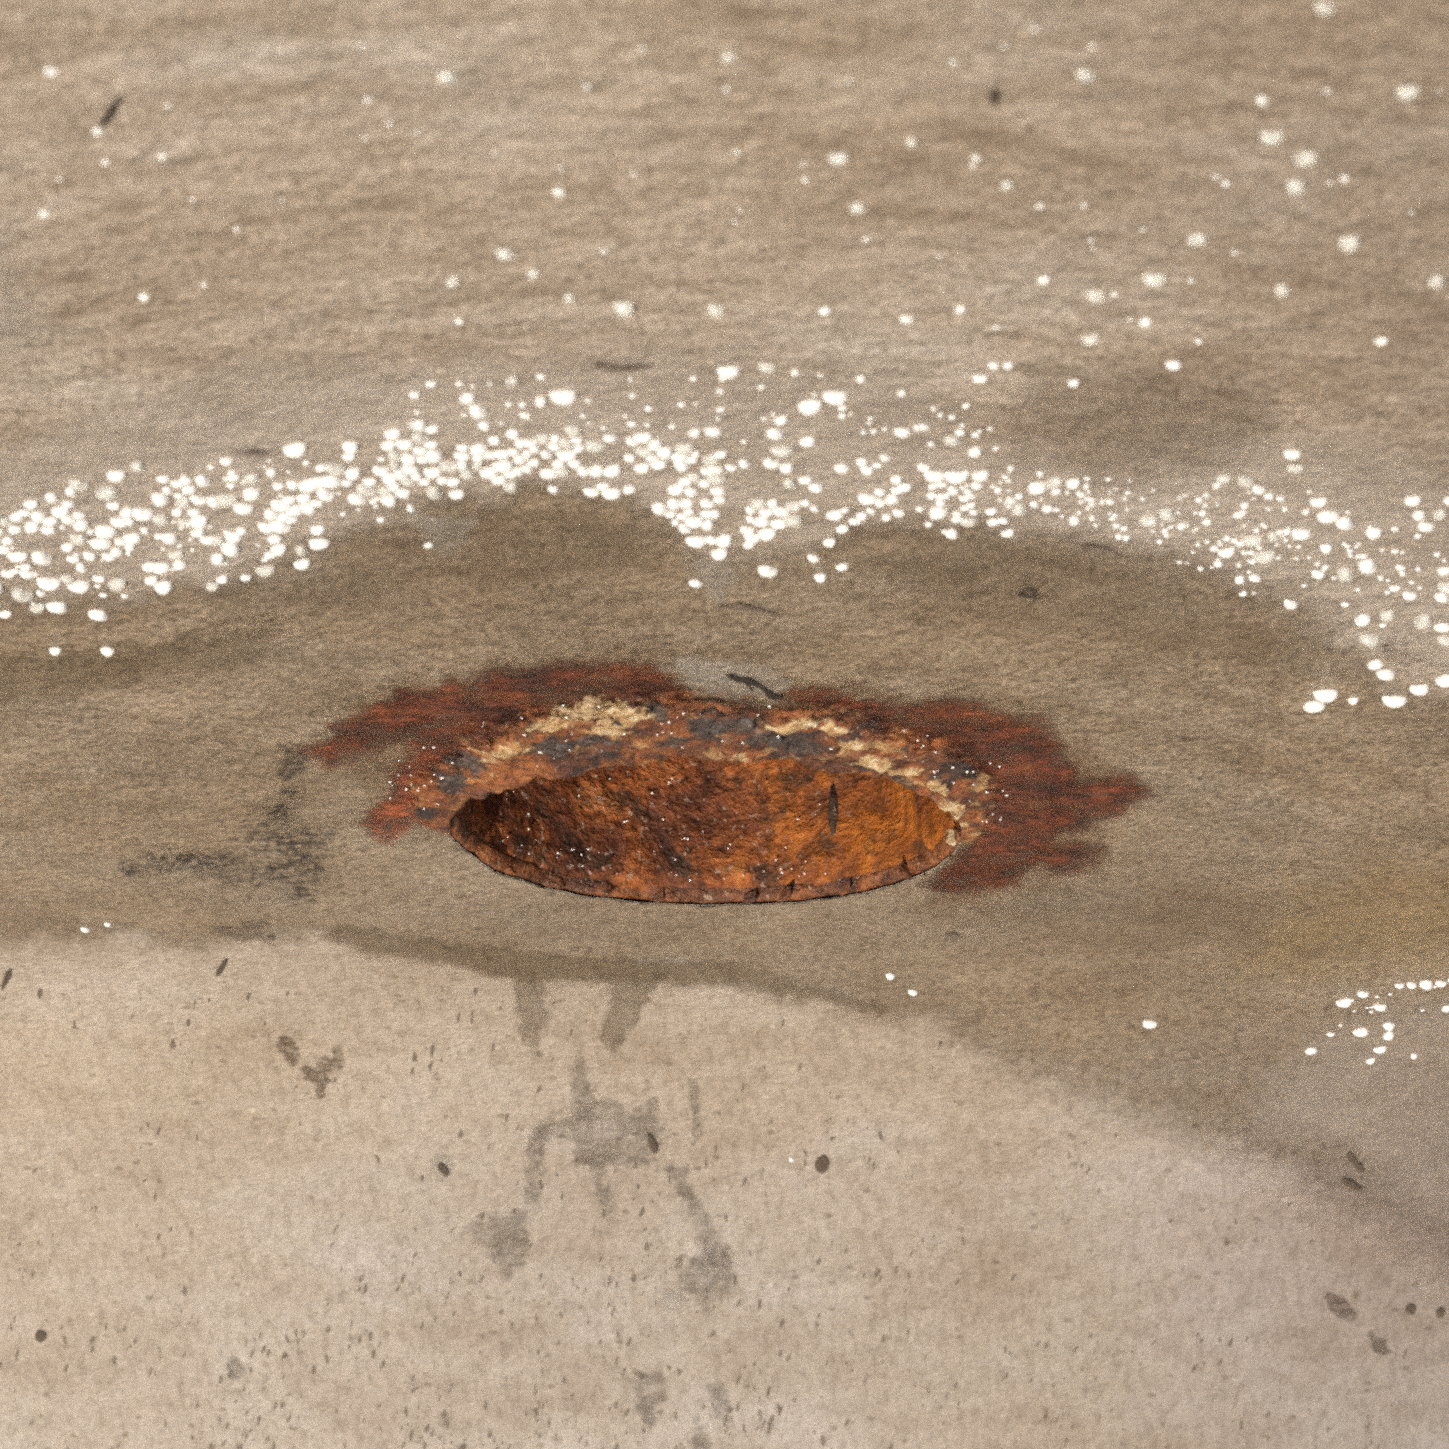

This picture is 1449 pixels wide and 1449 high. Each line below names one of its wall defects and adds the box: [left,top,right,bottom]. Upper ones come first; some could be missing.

water stain [44,68,59,76]
water stain [1127,318,1152,327]
rust [300,664,685,835]
water stain [0,357,1449,1231]
rust [791,689,1147,892]
peeling [827,785,838,836]
peeling [945,829,957,846]
peeling [898,862,914,879]
peeling [739,891,757,904]
water stain [1327,1294,1355,1319]